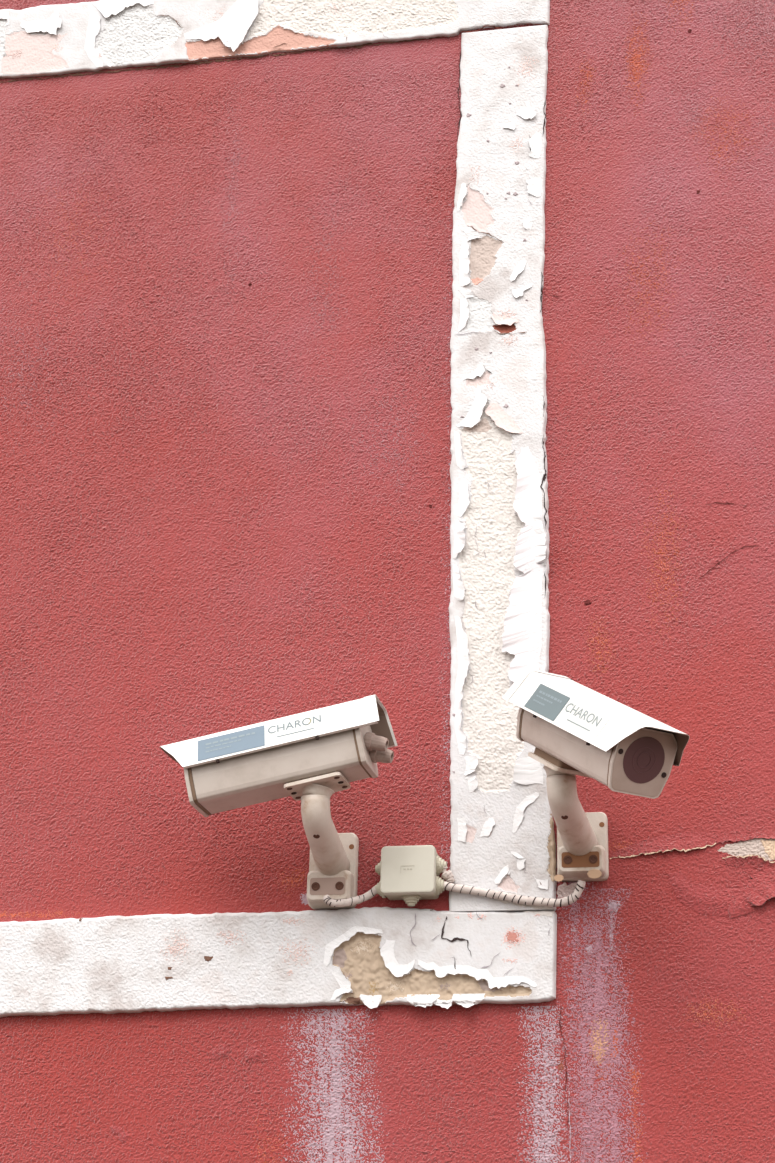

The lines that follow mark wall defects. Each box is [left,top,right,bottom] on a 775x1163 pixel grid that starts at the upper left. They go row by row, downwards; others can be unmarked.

peeling [0,10,69,78]
peeling [84,0,458,69]
peeling [515,133,542,165]
peeling [504,178,542,200]
peeling [457,183,519,334]
peeling [452,347,548,833]
peeling [457,817,497,844]
peeling [494,851,548,893]
peeling [610,829,775,870]
spalling [323,926,537,1009]
crack [410,909,513,975]